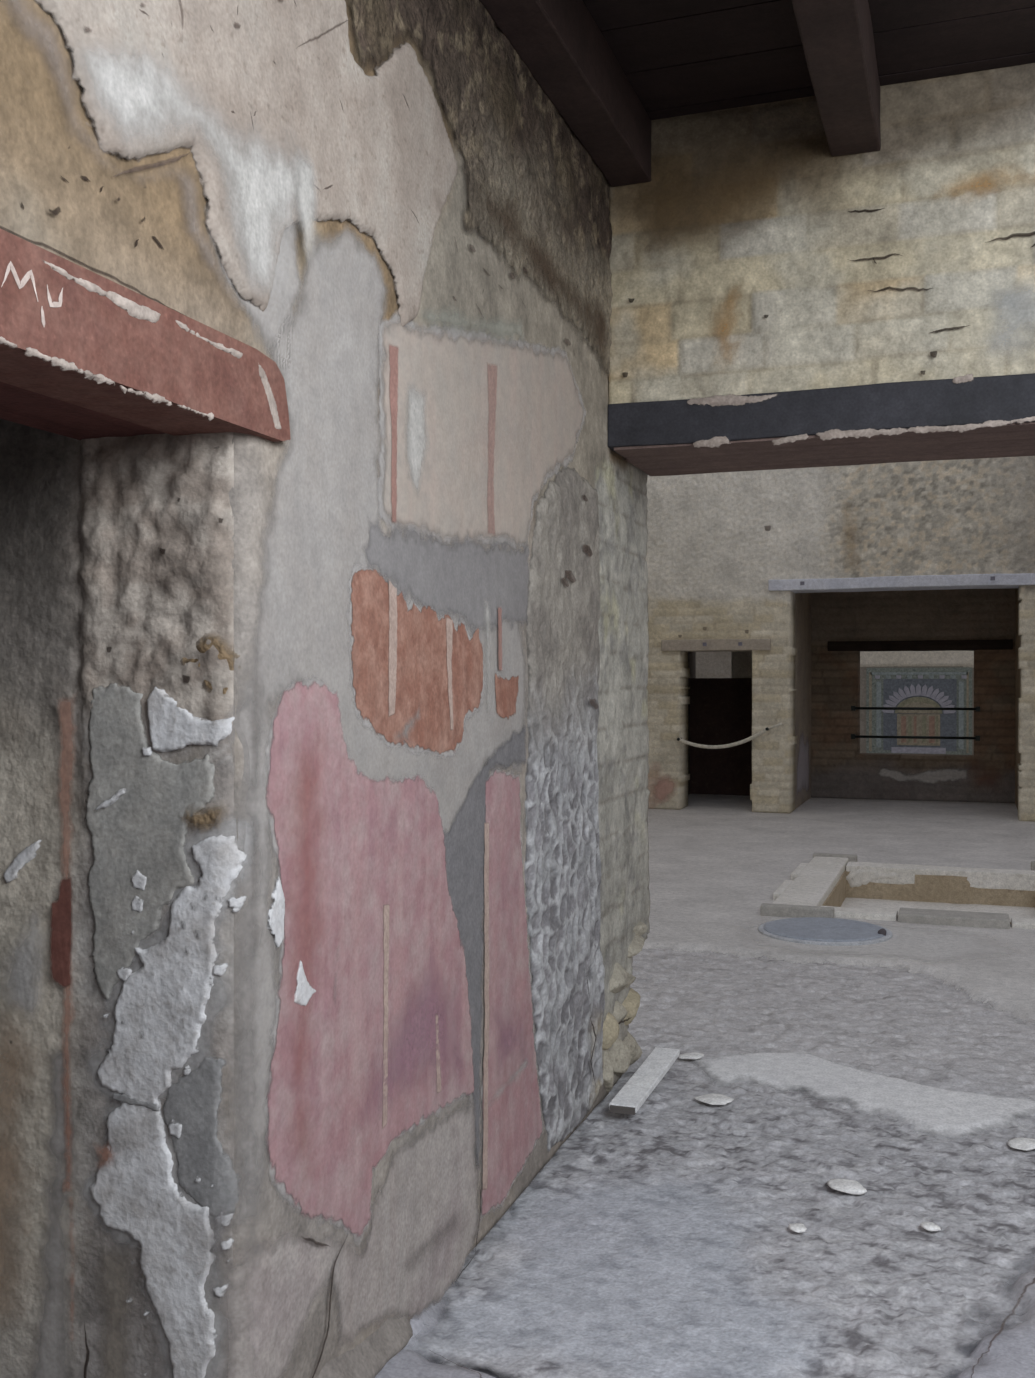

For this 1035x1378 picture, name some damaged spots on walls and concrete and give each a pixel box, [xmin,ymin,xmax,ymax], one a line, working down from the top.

flaking render [0,0,634,429]
crack [988,231,1035,247]
peeling [687,394,777,407]
peeling [953,374,973,384]
peeling [693,436,729,448]
peeling [772,416,1035,445]
flaking render [182,636,236,694]
flaking render [142,687,235,756]
flaking render [95,788,125,810]
flaking render [83,808,479,1378]
crack [457,1173,481,1280]
crack [971,1278,1035,1378]